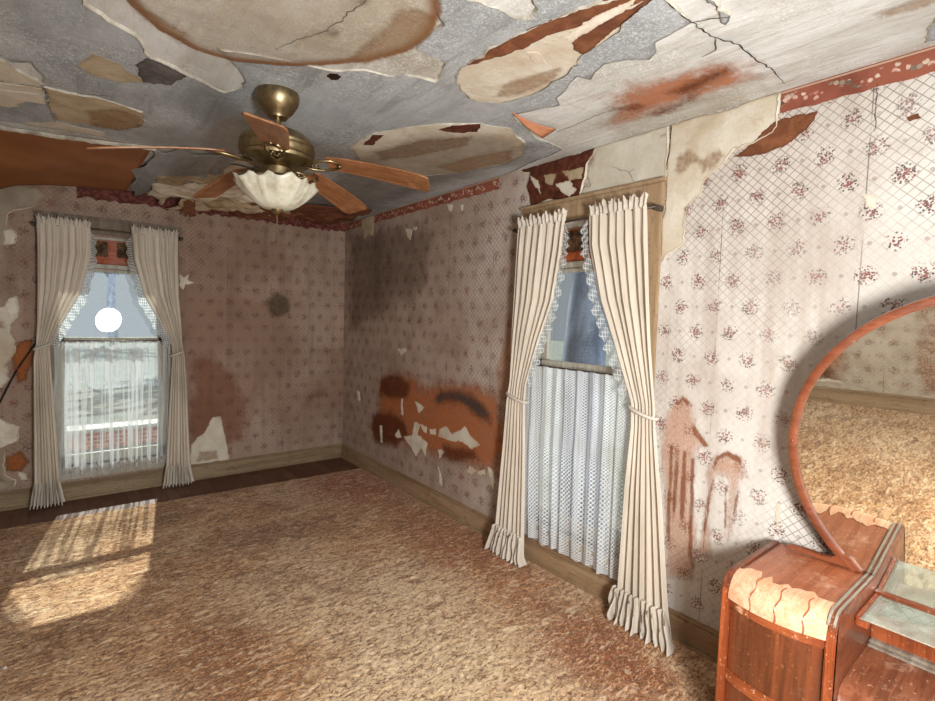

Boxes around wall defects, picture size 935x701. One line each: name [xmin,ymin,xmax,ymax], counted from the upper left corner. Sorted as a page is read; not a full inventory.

peeling [706,0,732,25]
water stain [128,0,442,66]
crack [664,0,785,84]
peeling [925,18,935,43]
water stain [613,66,740,120]
peeling [0,0,692,224]
peeling [5,297,19,322]
water stain [268,294,289,316]
peeling [0,419,19,448]